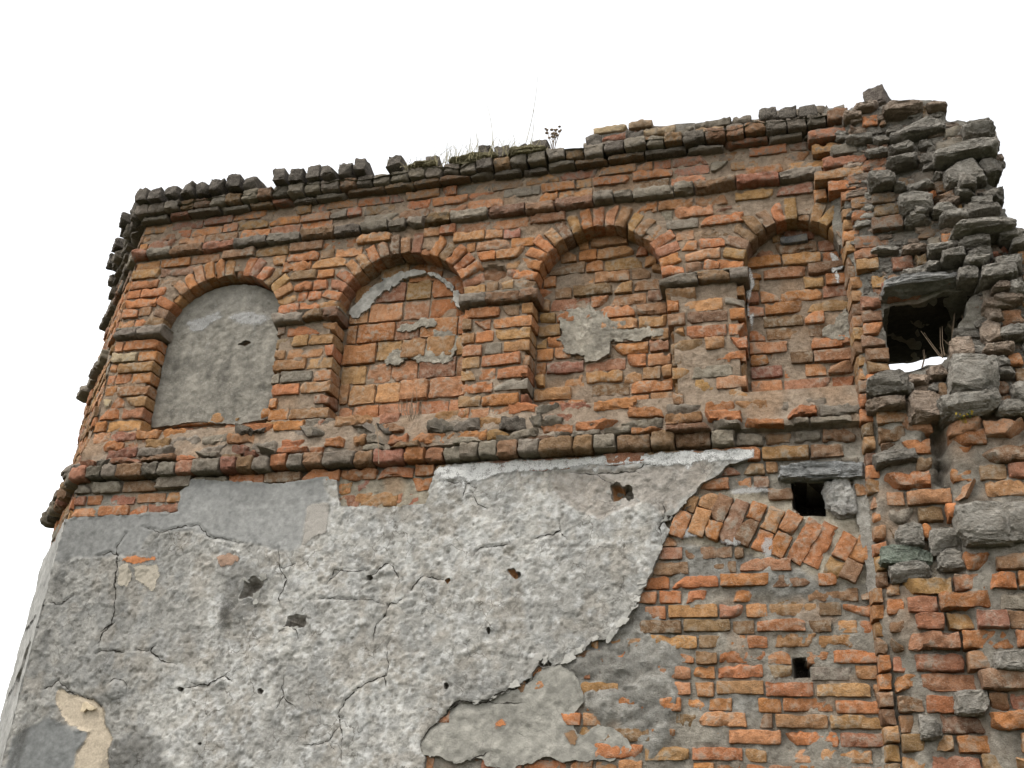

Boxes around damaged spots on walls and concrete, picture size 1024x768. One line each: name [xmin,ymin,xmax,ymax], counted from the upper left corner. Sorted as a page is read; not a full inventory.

hole [606,482,640,506]
spalling [117,555,160,591]
crack [98,525,243,663]
hole [239,572,267,605]
hole [278,613,311,630]
peeling [531,578,648,669]
crack [45,680,102,707]
crack [182,671,231,689]
crack [306,563,443,766]
crack [421,666,540,752]
peeling [467,679,521,705]
peeling [55,690,113,768]